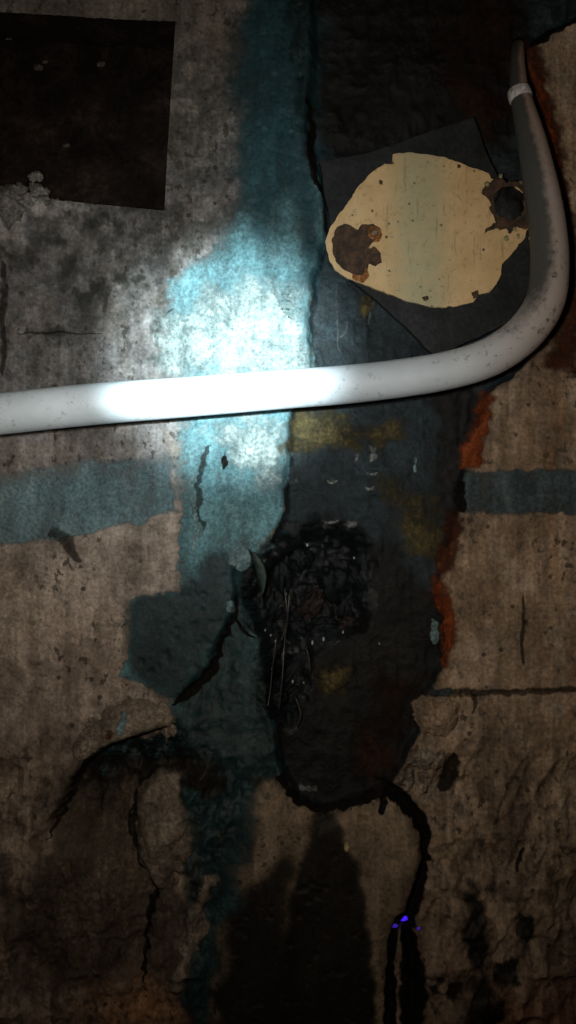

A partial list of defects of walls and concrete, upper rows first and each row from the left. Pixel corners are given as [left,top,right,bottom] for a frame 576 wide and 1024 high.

rust [460,391,496,468]
crack [172,591,255,725]
crack [428,594,576,714]
crack [46,741,131,841]
leakage [96,553,376,1024]
crack [128,764,163,984]